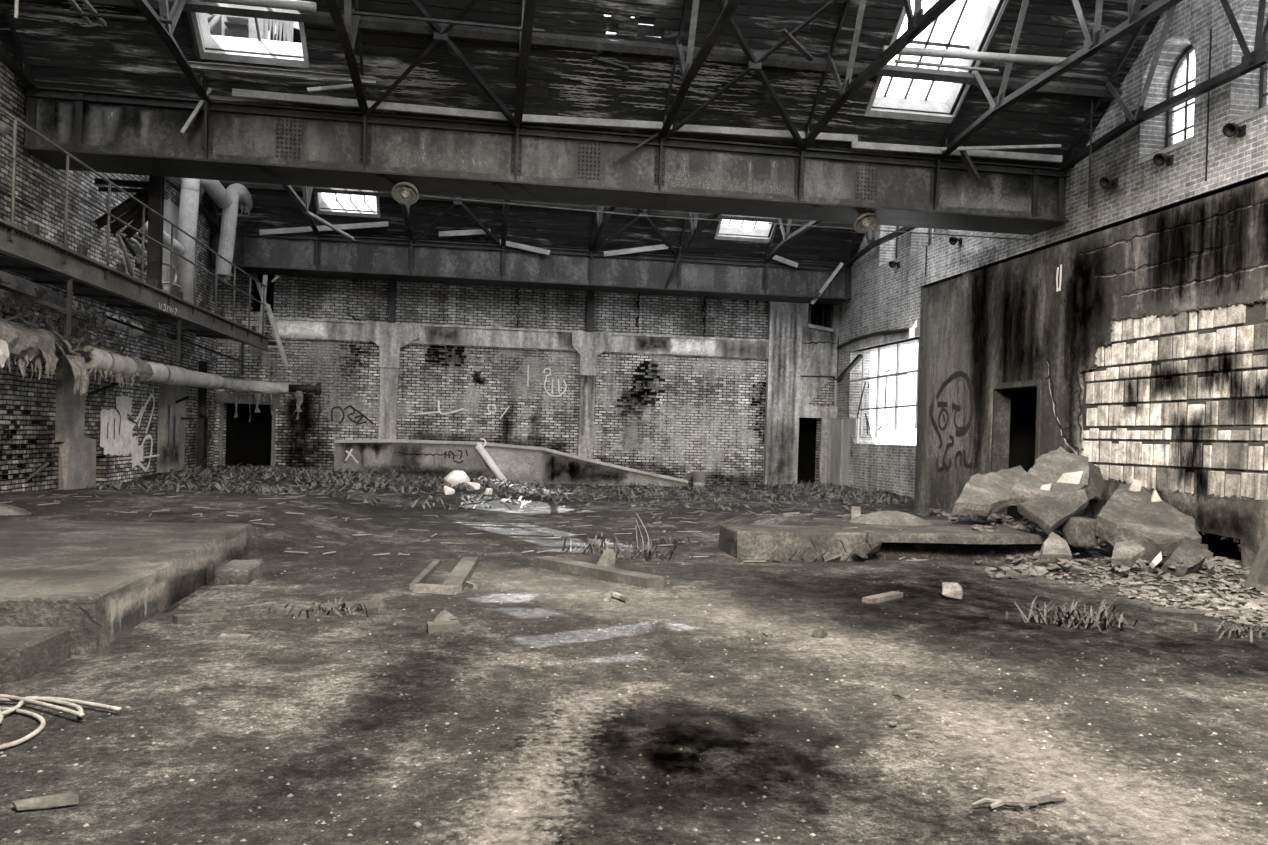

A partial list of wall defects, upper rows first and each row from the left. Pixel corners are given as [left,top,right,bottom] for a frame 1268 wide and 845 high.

damp [1147,189,1268,294]
spalling [425,345,486,384]
spalling [616,361,665,419]
spalling [1076,297,1268,502]
spalling [0,402,53,482]